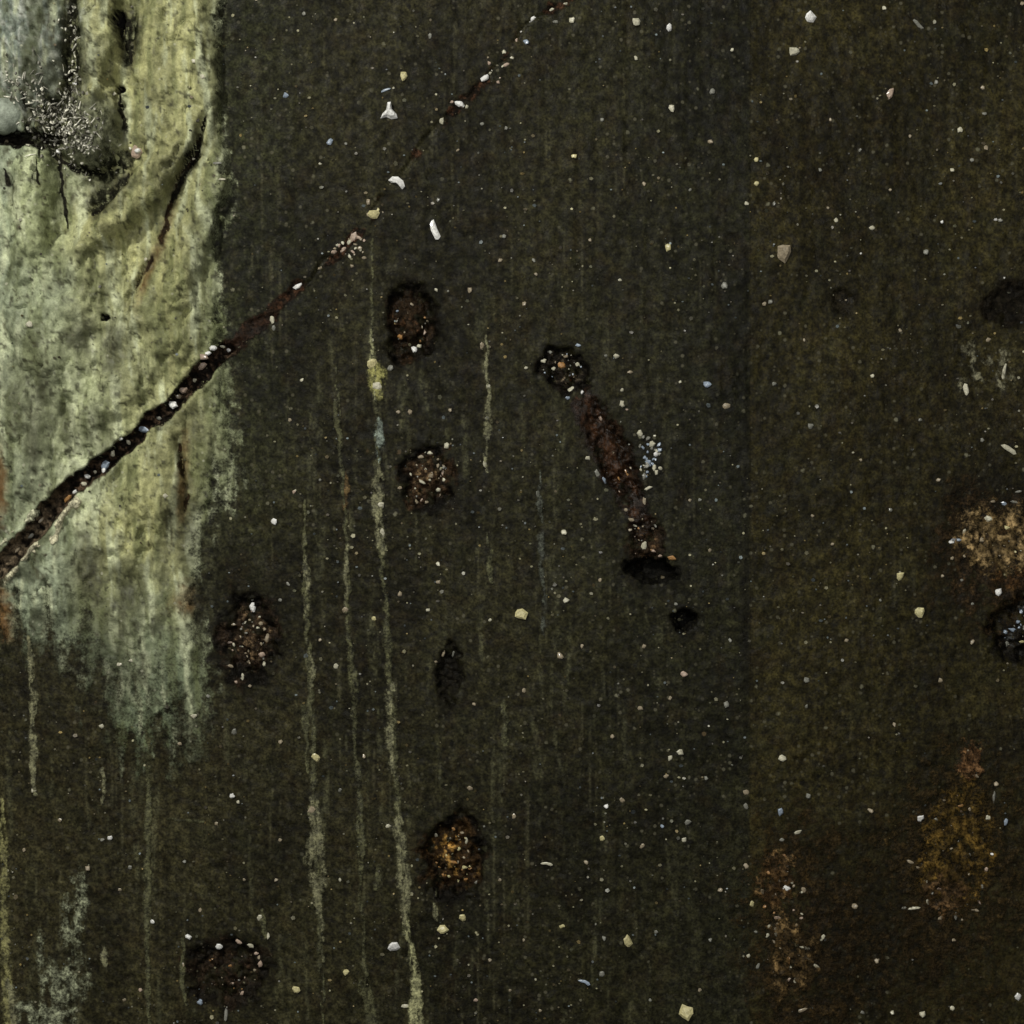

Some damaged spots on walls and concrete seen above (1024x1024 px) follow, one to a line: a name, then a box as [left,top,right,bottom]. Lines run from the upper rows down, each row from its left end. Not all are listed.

crack [439,50,514,124]
crack [530,0,574,23]
damp [0,0,243,1024]
crack [0,199,384,585]
damp [257,909,270,939]
efflorescence [301,499,327,1024]
damp [333,367,382,1024]
efflorescence [367,238,423,1024]